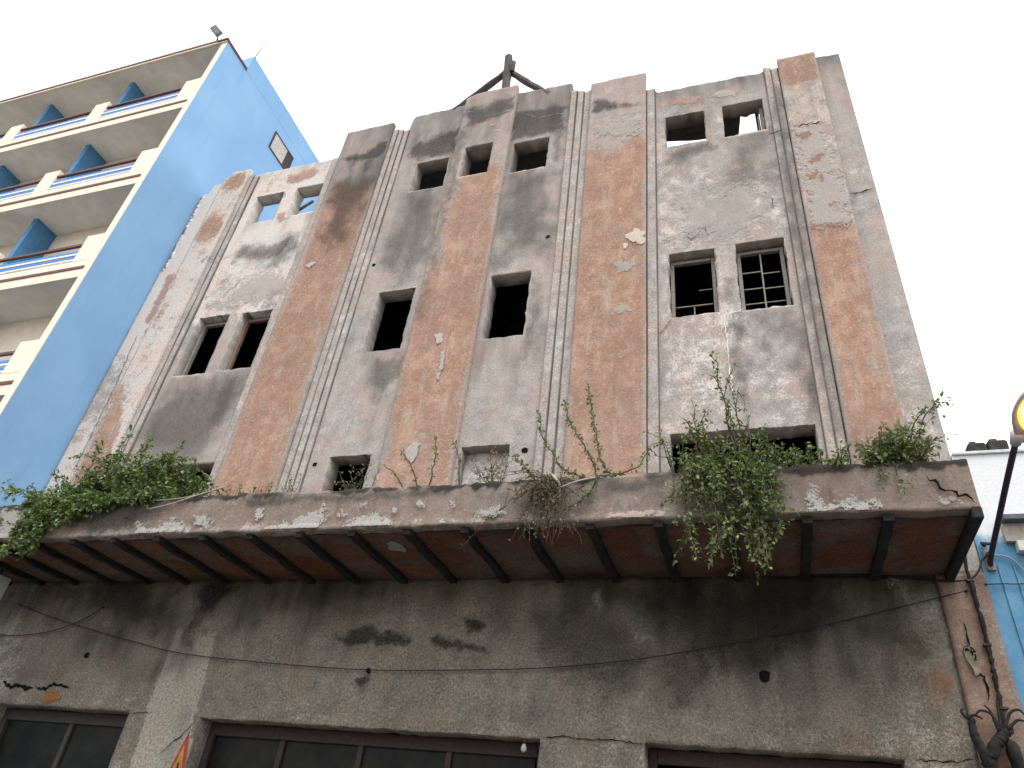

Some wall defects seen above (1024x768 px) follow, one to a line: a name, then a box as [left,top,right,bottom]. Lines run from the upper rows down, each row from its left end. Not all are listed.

leakage [593,99,626,113]
leakage [239,236,296,265]
peeling [622,228,645,249]
crack [718,307,746,406]
peeling [802,483,883,511]
crack [926,475,977,504]
peeling [133,514,215,533]
peeling [254,501,400,529]
leakage [340,626,411,645]
leakage [431,619,484,651]
crack [3,681,69,691]
crack [979,674,989,701]